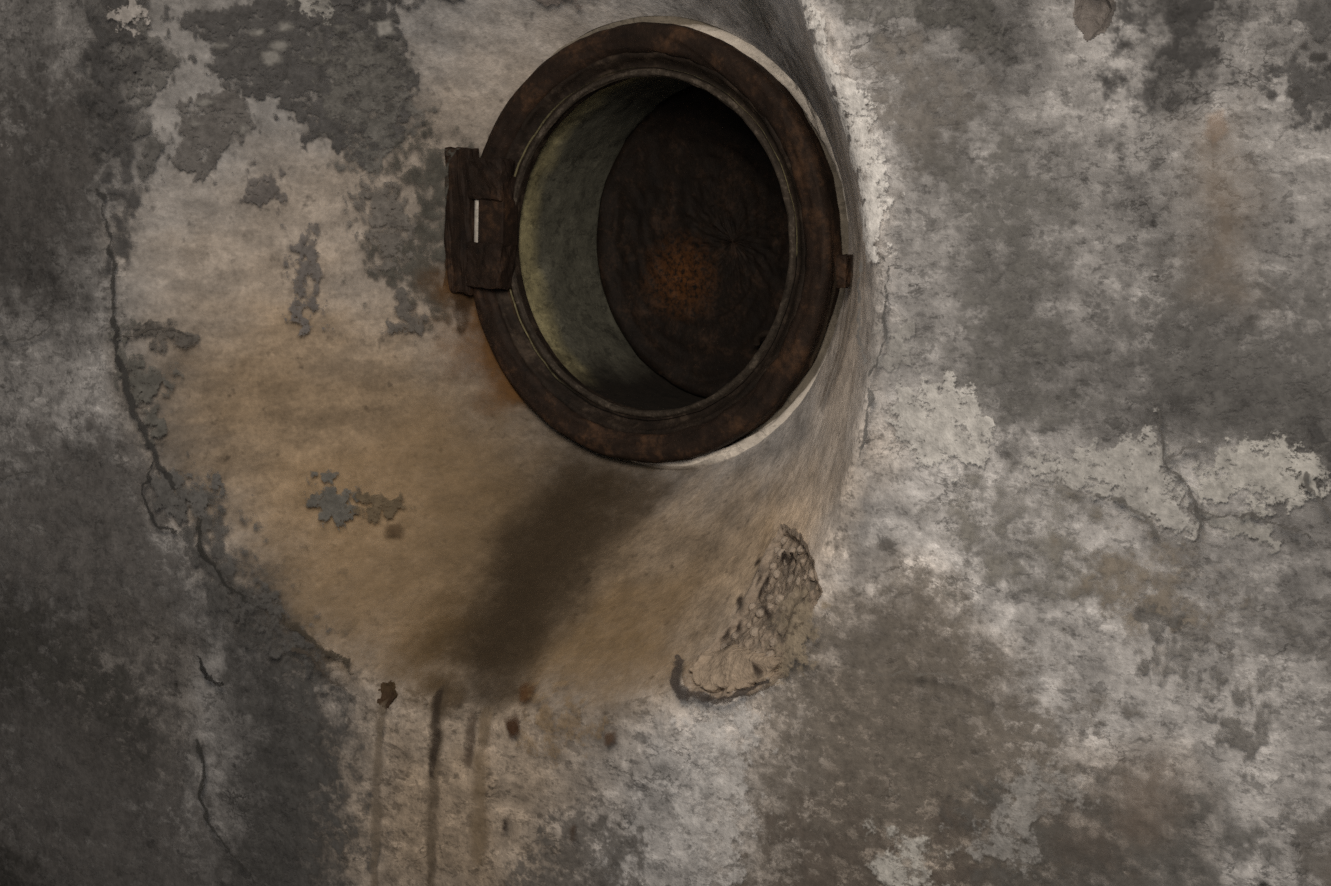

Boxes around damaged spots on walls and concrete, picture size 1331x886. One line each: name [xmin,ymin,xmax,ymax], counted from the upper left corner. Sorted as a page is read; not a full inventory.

spalling [1073,0,1116,42]
crack [95,188,248,603]
corrosion [448,287,519,402]
leakage [0,413,380,886]
crack [197,656,224,687]
peeling [304,469,415,536]
leakage [451,454,670,689]
spalling [669,523,829,705]
crack [195,739,256,884]